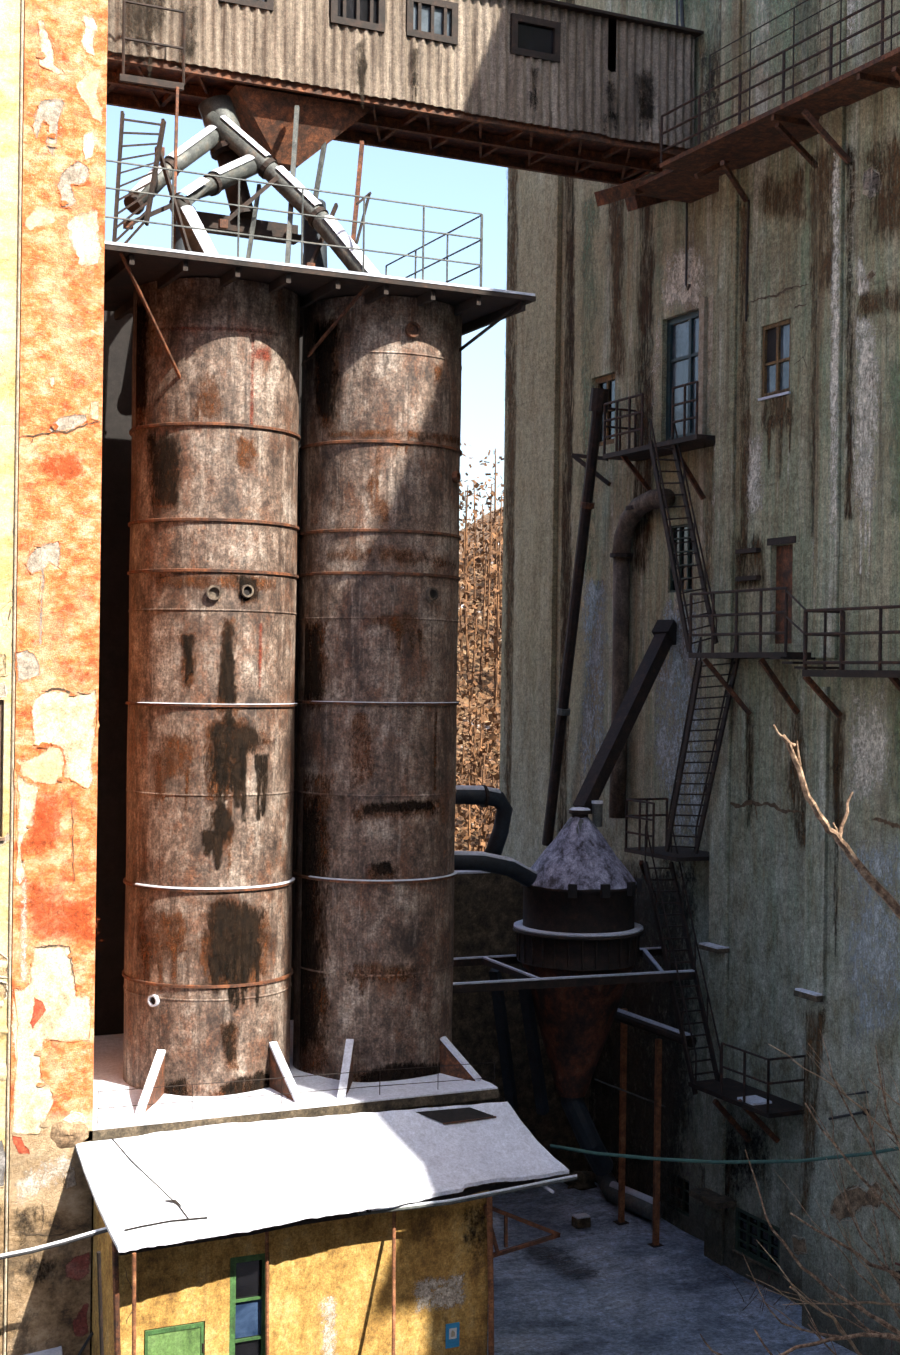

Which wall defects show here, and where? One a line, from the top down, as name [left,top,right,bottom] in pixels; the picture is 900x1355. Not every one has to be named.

peeling [25,14,103,266]
leakage [558,177,704,832]
leakage [735,130,900,590]
peeling [0,540,100,885]
rust [154,684,270,869]
peeling [0,942,93,1189]